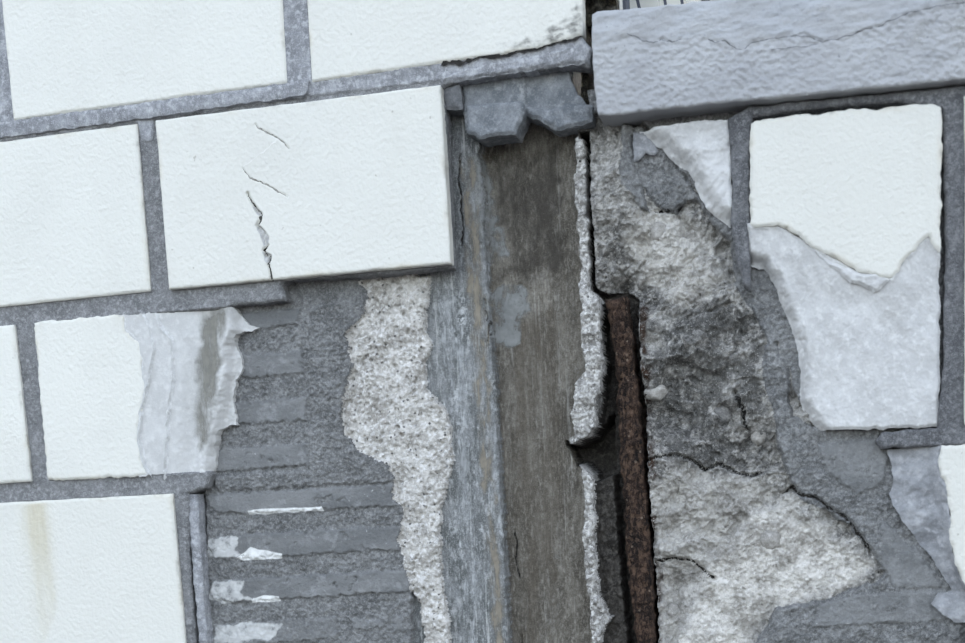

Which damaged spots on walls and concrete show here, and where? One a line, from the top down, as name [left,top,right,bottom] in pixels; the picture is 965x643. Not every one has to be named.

spalling [585,0,620,48]
crack [243,124,288,281]
spalling [340,274,456,643]
corrosion [639,307,657,486]
corrosion [650,511,663,643]
spalling [578,73,884,643]
spalling [747,223,941,431]
spalling [887,445,965,623]